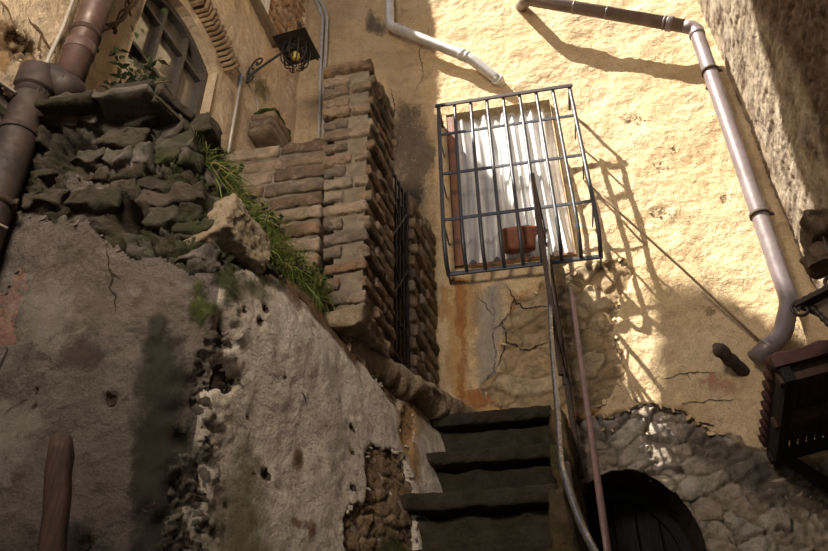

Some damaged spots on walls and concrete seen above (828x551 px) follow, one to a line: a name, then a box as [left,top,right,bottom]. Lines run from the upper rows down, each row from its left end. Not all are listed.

damp [366,14,384,33]
damp [392,106,436,206]
damp [128,417,185,537]
flaking render [155,326,241,551]
flaking render [343,375,418,551]
rust [438,278,504,411]
crack [477,285,548,380]
flaking render [480,256,828,551]